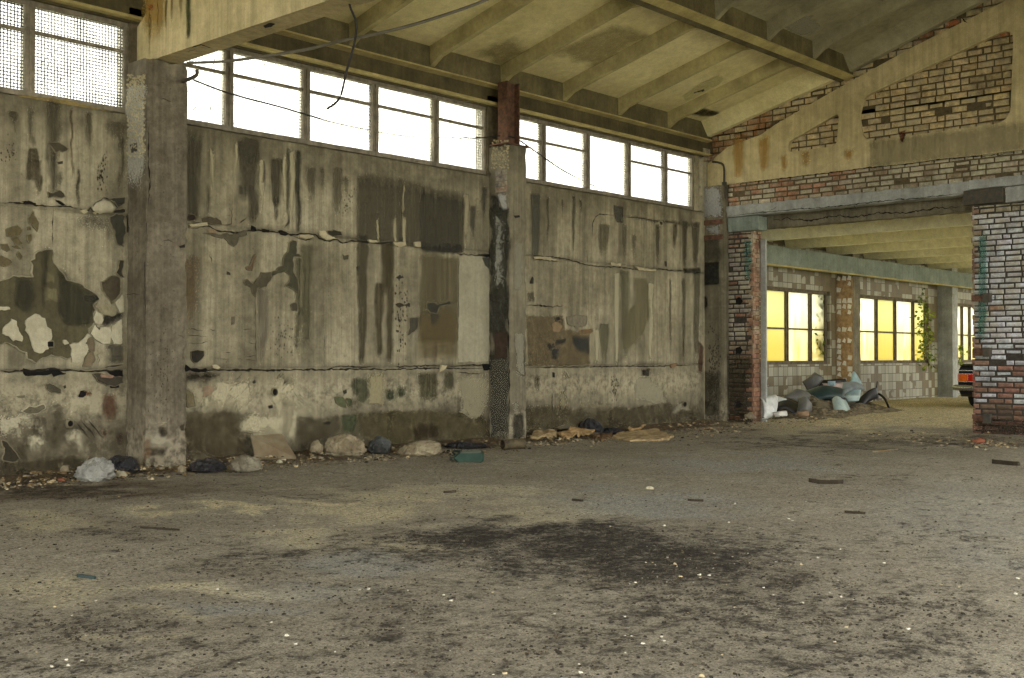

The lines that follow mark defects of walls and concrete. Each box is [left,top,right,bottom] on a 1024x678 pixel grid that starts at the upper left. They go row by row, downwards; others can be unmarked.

water stain [9,101,60,192]
crack [8,200,99,242]
peeling [0,211,125,398]
water stain [186,137,214,218]
crack [126,133,490,318]
water stain [233,137,508,361]
peeling [482,170,534,438]
crack [529,254,695,271]
crack [3,326,123,384]
crack [179,287,694,429]
water stain [184,412,245,457]
water stain [298,416,340,448]